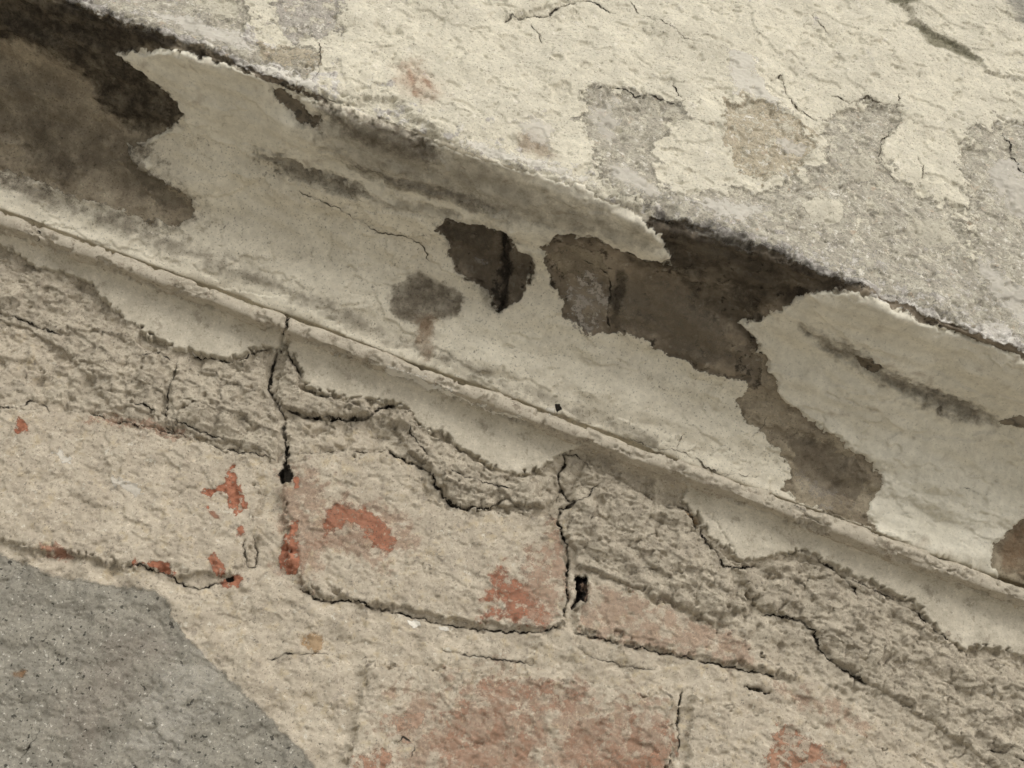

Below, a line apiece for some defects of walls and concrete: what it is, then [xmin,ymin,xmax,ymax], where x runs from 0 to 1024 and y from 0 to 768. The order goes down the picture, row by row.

crack [0,313,58,334]
water stain [391,275,462,339]
flaking render [0,0,1024,588]
crack [93,318,393,484]
crack [327,426,509,510]
crack [629,435,747,477]
crack [129,562,216,590]
crack [302,454,776,694]
crack [818,560,890,597]
crack [764,614,865,684]